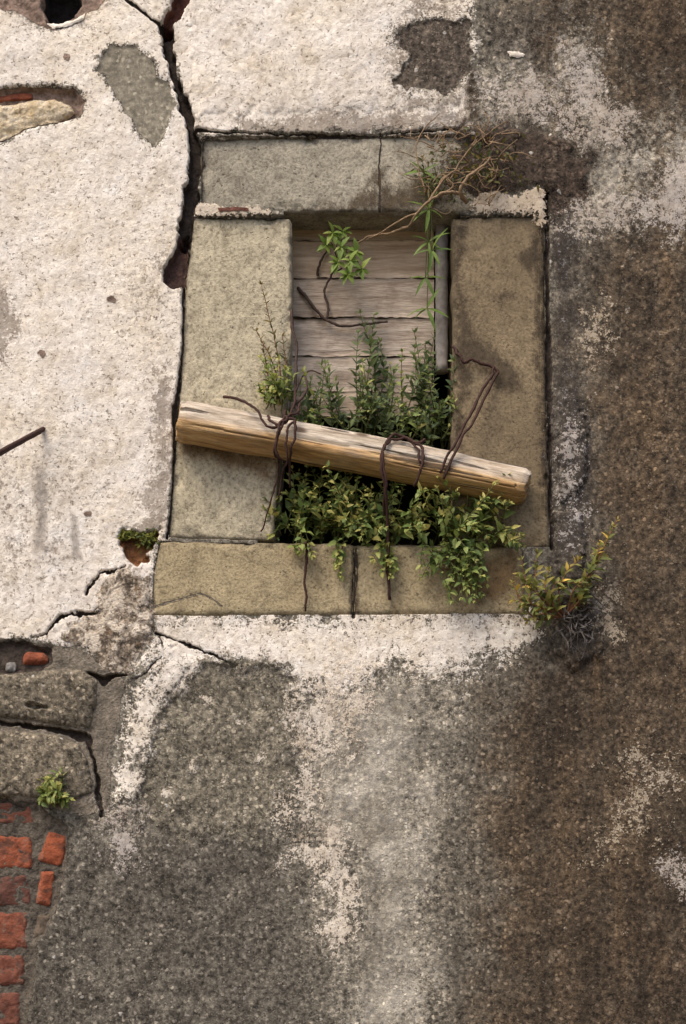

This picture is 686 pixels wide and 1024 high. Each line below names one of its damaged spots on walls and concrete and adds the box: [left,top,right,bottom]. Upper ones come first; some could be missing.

spalling [0,87,85,142]
spalling [0,0,104,30]
crack [125,0,459,251]
peeling [392,17,473,95]
crack [166,289,186,540]
damp [329,35,686,665]
crack [32,566,126,638]
crack [88,592,231,687]
spalling [0,528,164,1024]
damp [88,794,150,874]
damp [268,657,385,973]
damp [568,729,686,901]